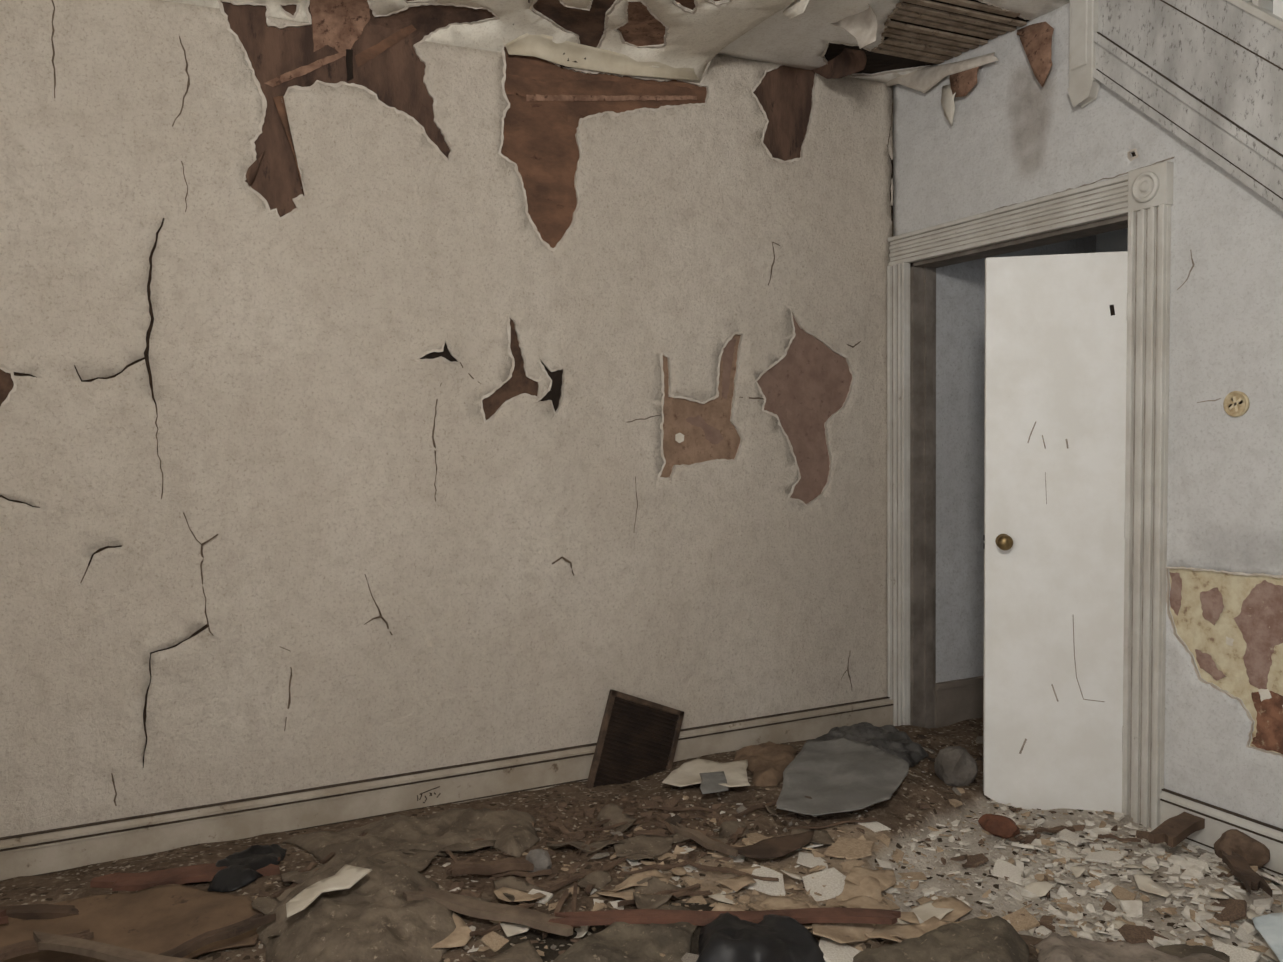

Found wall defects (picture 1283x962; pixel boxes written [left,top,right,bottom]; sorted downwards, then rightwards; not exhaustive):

crack [172,36,190,126]
flaking render [217,0,500,221]
flaking render [498,0,709,252]
flaking render [752,64,818,163]
crack [0,495,40,508]
crack [14,371,37,379]
crack [74,161,218,768]
flaking render [480,314,565,423]
flaking render [658,332,743,481]
flaking render [755,308,855,507]
crack [364,574,393,635]
flaking render [1166,566,1283,757]